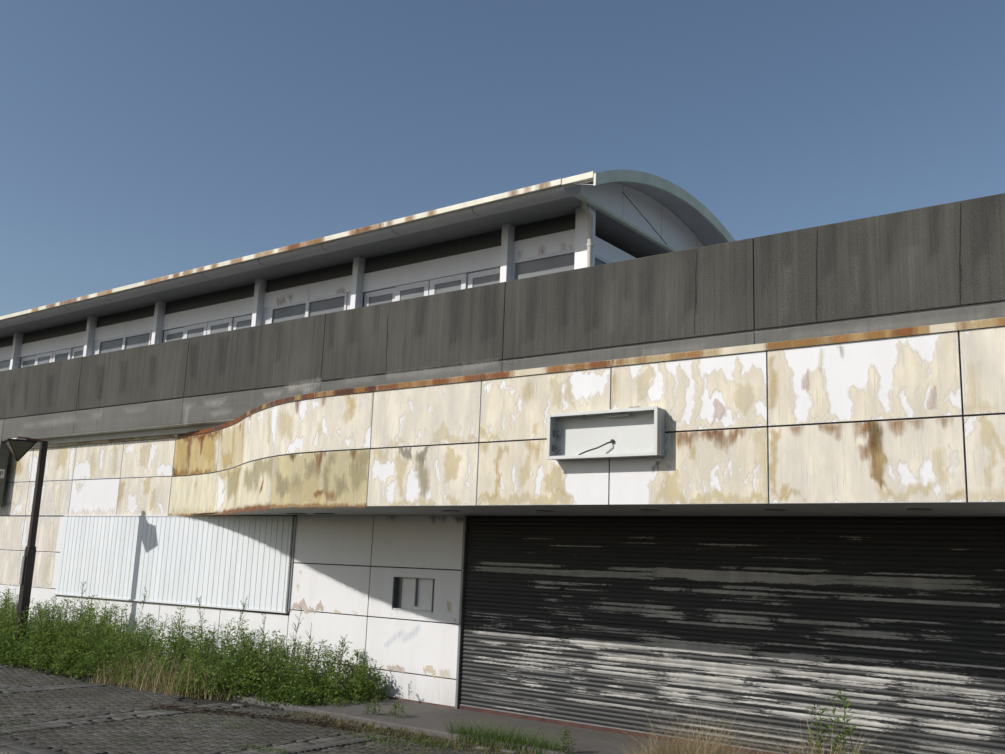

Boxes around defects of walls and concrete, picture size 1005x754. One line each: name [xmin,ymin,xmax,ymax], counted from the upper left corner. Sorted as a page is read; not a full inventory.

corrosion [149,263,216,283]
corrosion [284,238,321,251]
corrosion [178,371,510,454]
corrosion [856,422,886,485]
corrosion [169,490,366,516]
peeling [464,538,1005,754]